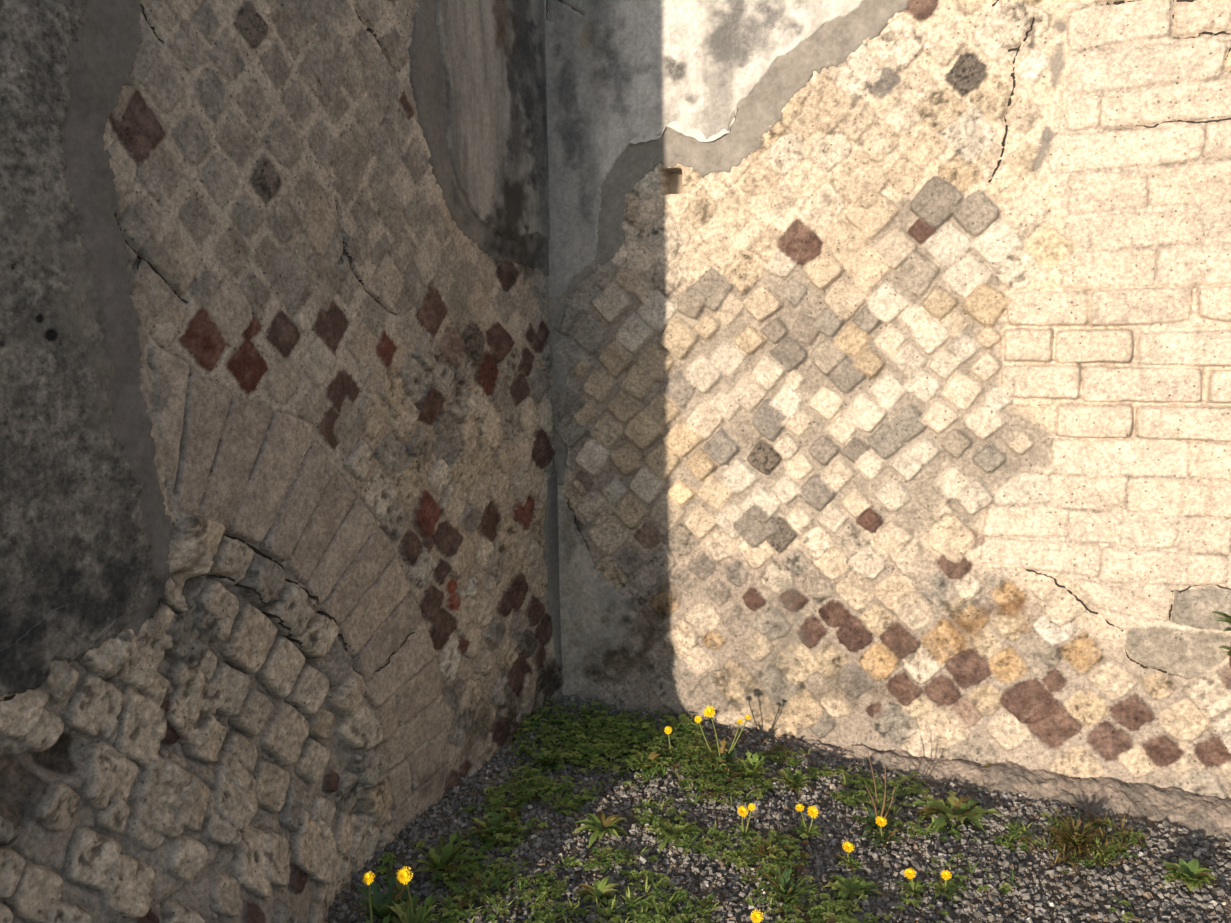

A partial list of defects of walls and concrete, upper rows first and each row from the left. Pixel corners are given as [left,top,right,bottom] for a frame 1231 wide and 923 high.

leakage [509,0,543,162]
peeling [434,0,863,299]
crack [988,17,1035,183]